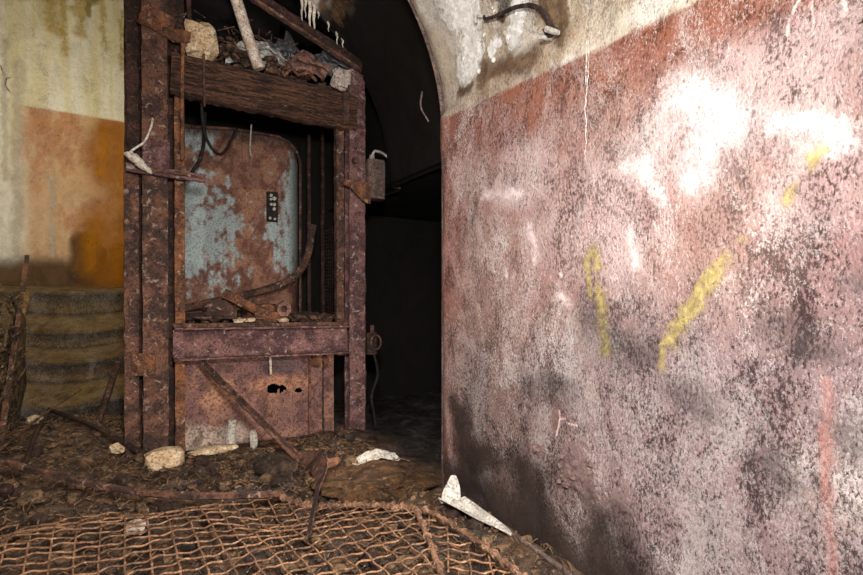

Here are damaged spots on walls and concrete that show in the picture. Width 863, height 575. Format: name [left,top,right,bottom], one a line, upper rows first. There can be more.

water stain [47,0,106,52]
peeling [434,0,529,88]
water stain [0,41,124,287]
water stain [444,396,643,575]